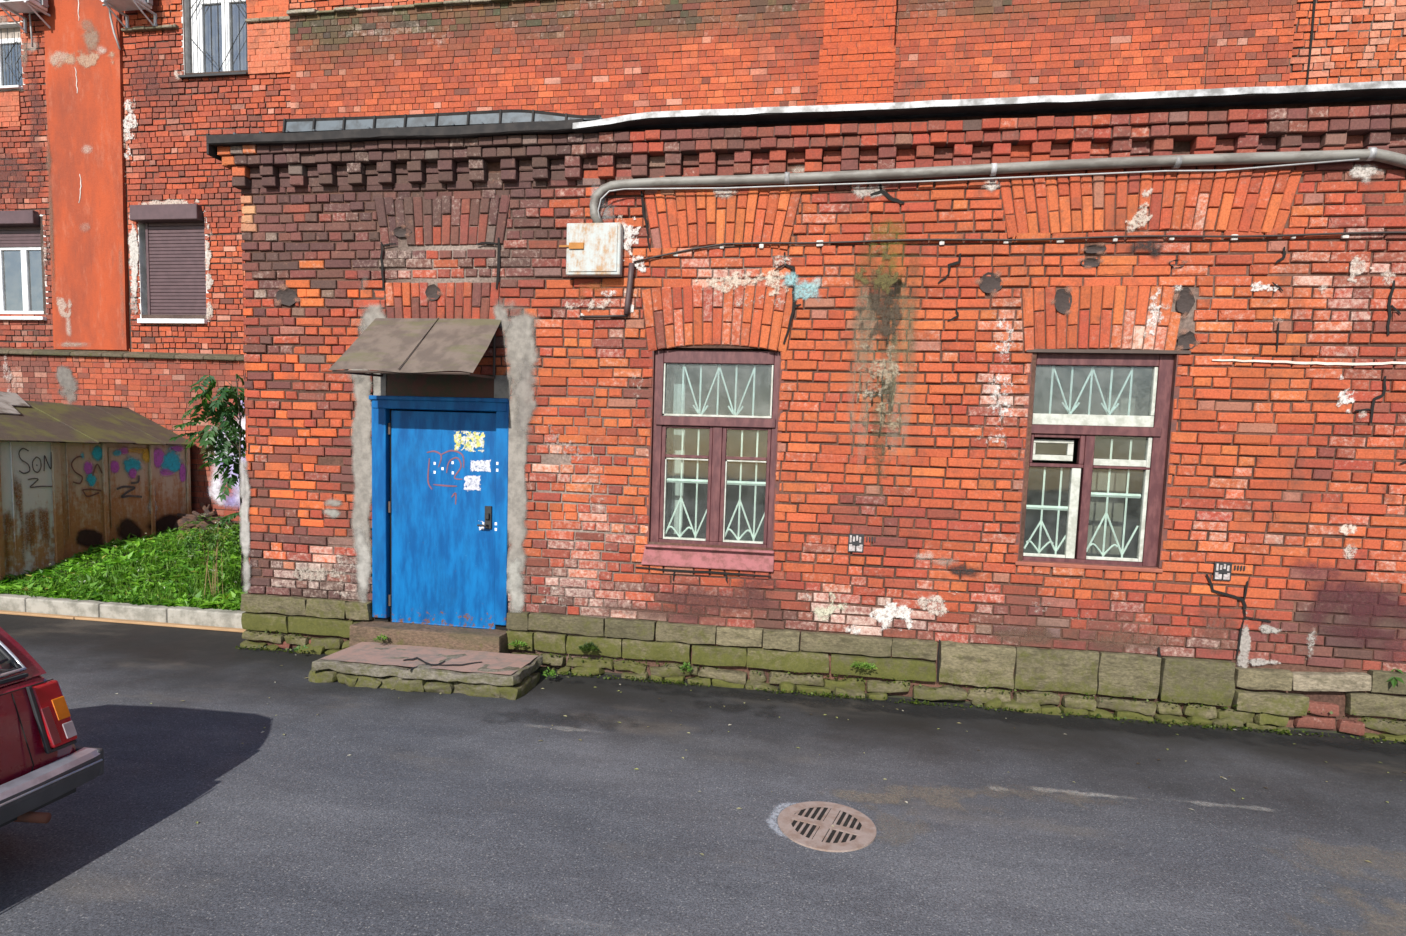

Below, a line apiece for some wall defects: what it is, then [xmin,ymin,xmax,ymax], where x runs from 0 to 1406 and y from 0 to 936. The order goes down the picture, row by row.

peeling [51,21,114,67]
peeling [123,101,137,158]
peeling [695,256,791,307]
water stain [851,250,916,477]